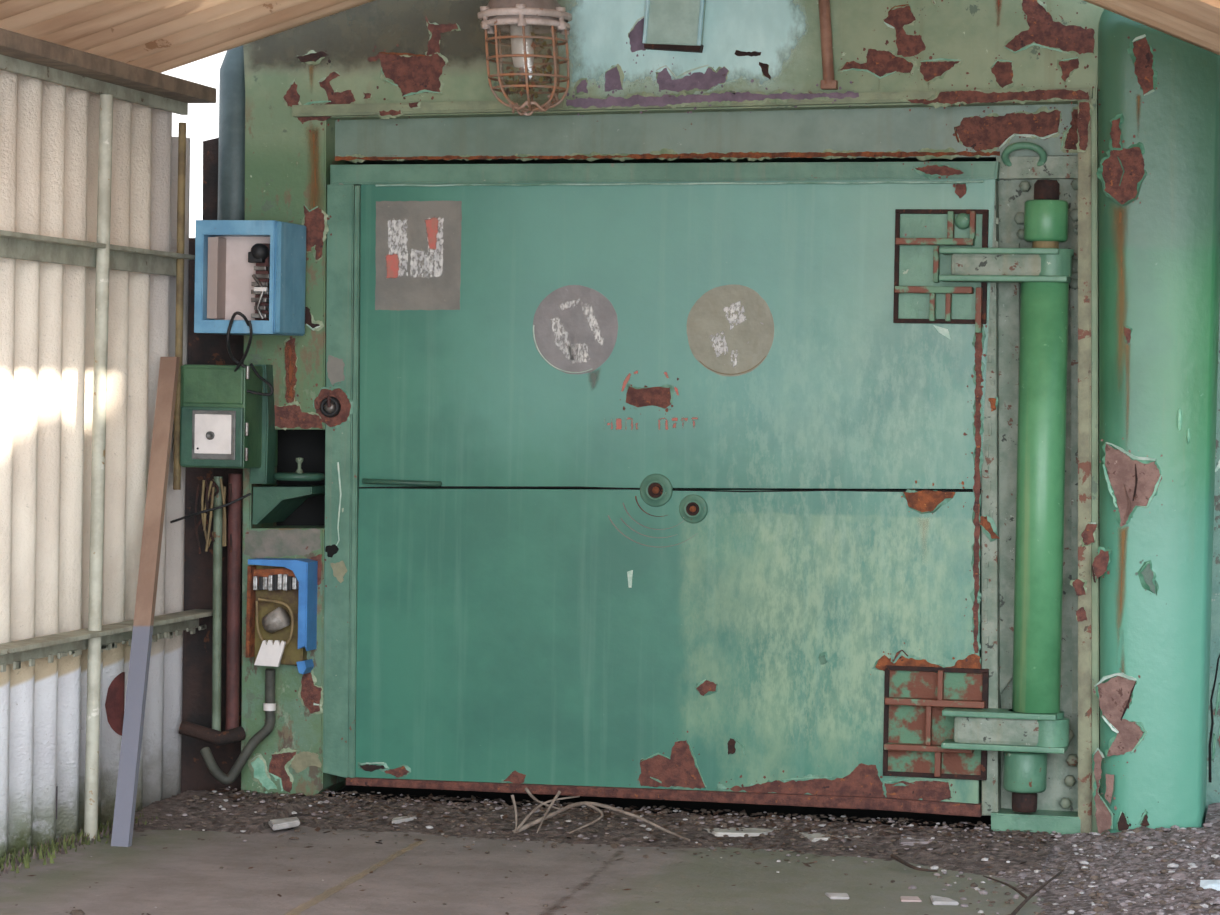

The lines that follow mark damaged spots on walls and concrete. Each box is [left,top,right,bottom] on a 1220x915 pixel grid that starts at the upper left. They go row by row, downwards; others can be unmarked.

corrosion [644,43,704,53]
peeling [563,2,969,117]
peeling [1004,0,1097,65]
corrosion [283,50,421,263]
corrosion [335,147,1000,198]
peeling [946,104,1078,156]
peeling [1096,25,1159,349]
corrosion [620,378,679,415]
corrosion [870,321,1000,675]
peeling [1080,432,1173,620]
corrosion [637,731,956,802]
peeling [1081,665,1159,834]